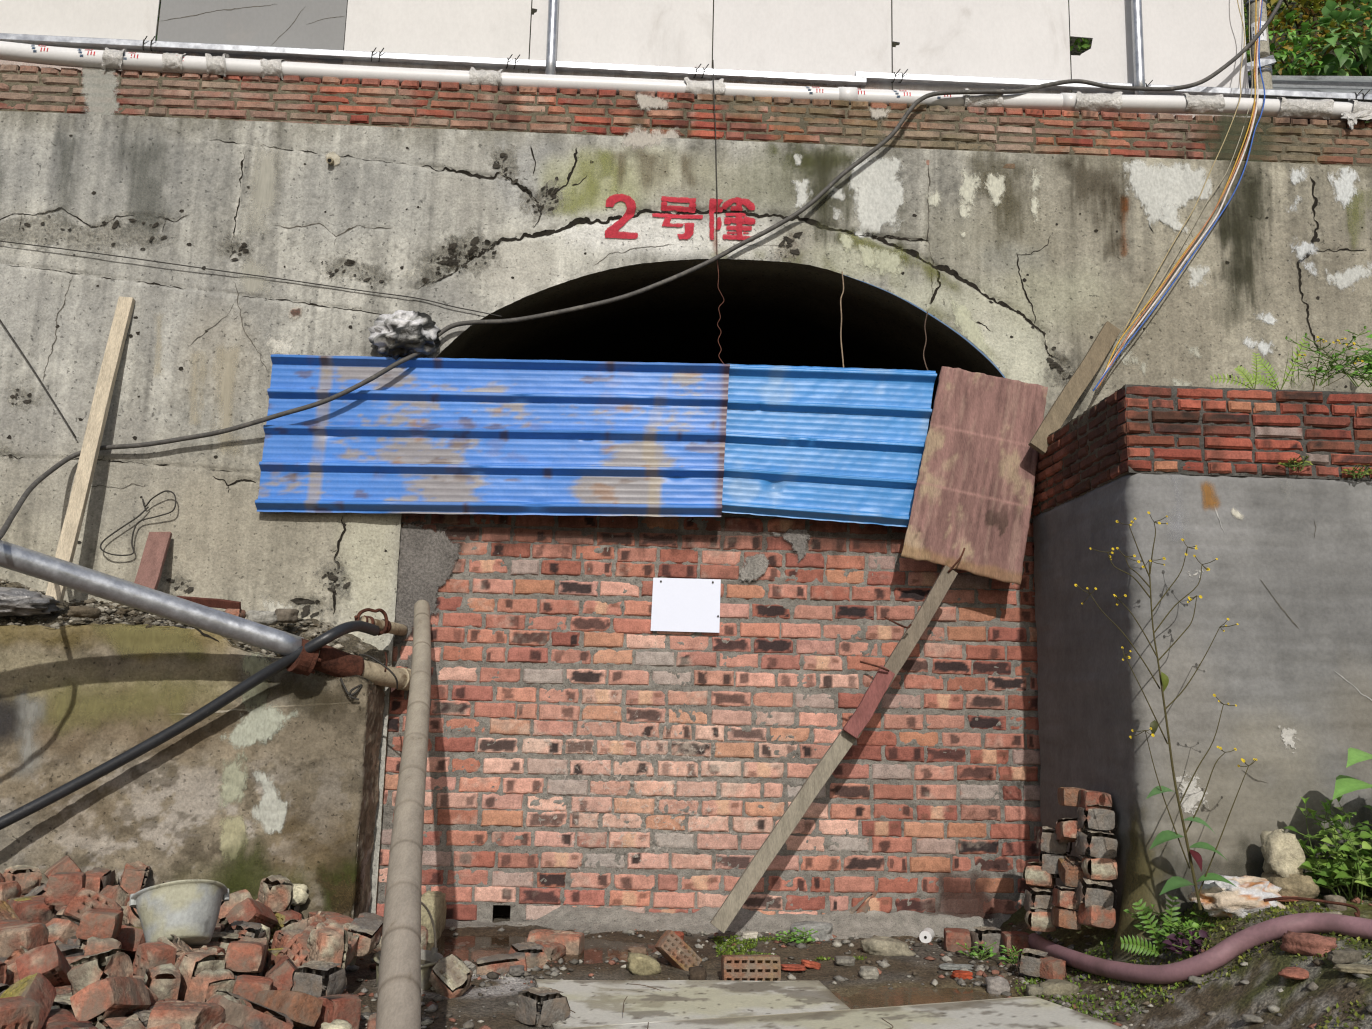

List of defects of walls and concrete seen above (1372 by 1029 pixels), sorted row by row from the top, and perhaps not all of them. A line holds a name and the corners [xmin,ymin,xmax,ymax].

crack [0,207,187,239]
crack [419,147,1062,367]
peeling [793,154,904,275]
peeling [1124,159,1212,232]
peeling [1189,267,1209,287]
peeling [1290,168,1306,209]
crack [1297,176,1364,358]
peeling [1291,241,1372,289]
peeling [1328,167,1360,207]
peeling [952,302,993,361]
crack [326,517,346,614]
damp [0,700,39,769]